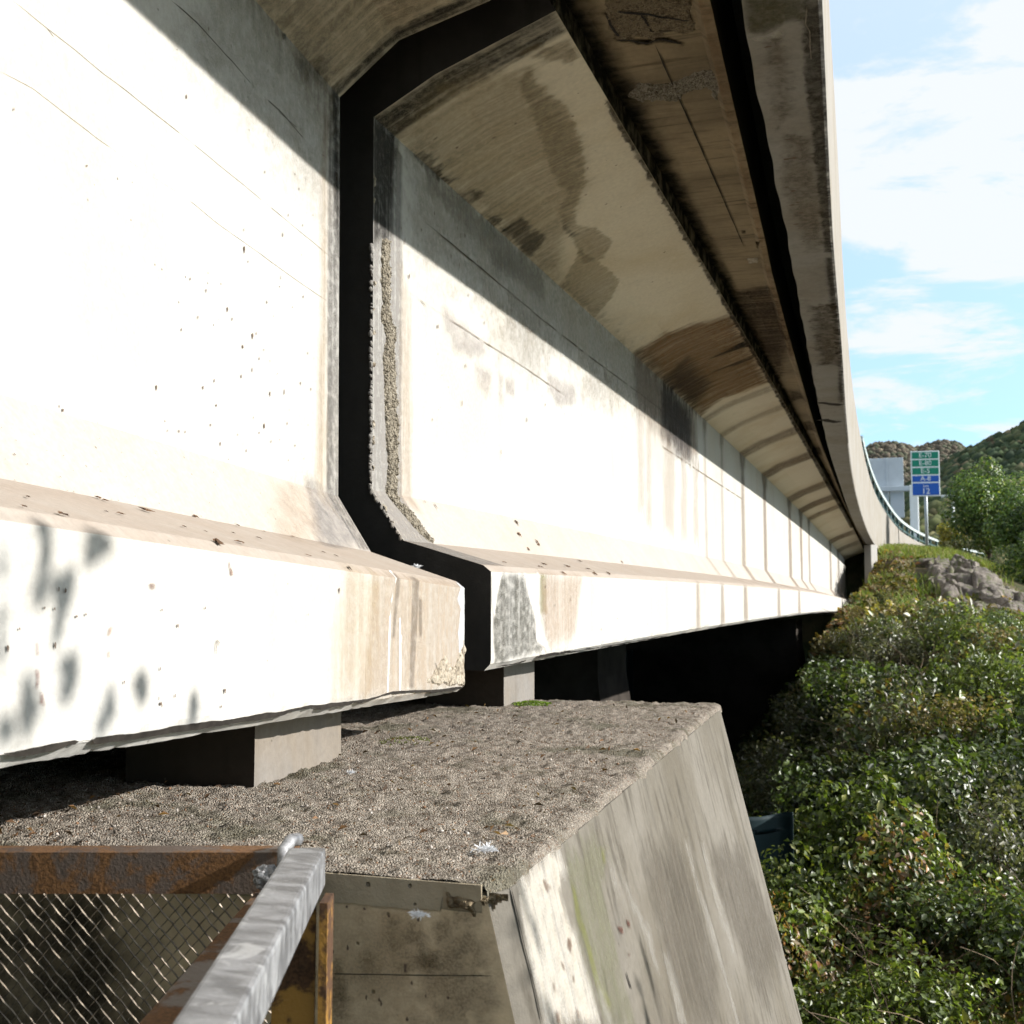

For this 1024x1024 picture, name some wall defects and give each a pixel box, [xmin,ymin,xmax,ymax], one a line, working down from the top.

spalling [604,0,696,41]
crack [6,2,333,301]
damp [374,0,864,615]
damp [526,573,577,650]
spalling [427,639,466,687]